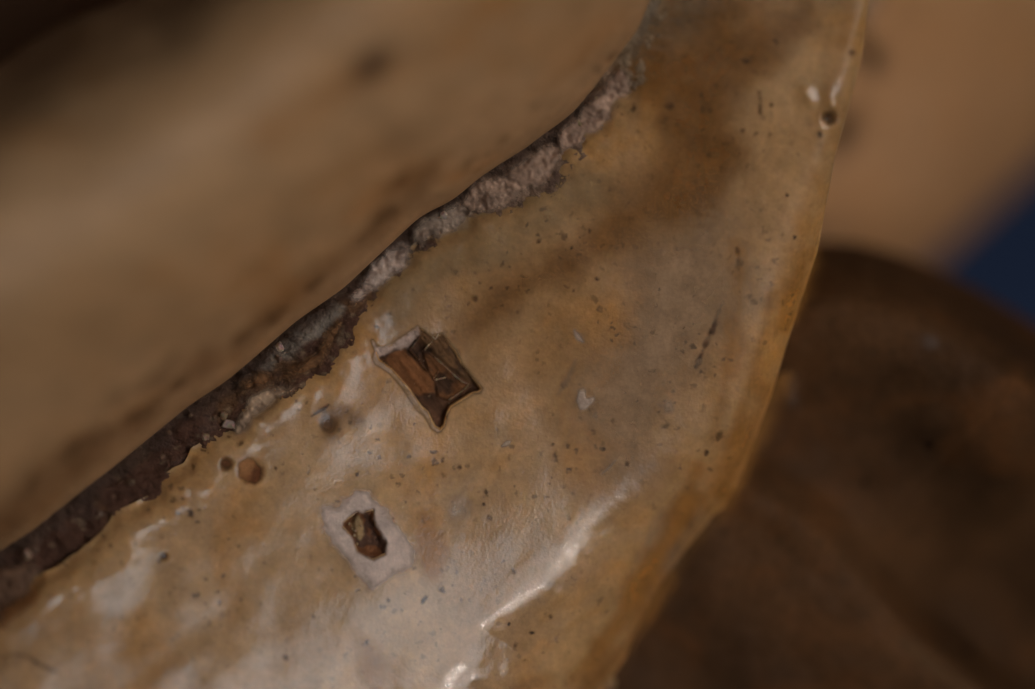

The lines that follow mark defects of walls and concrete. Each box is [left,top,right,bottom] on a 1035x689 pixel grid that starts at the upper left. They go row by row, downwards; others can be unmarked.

spalling [371,326,483,433]